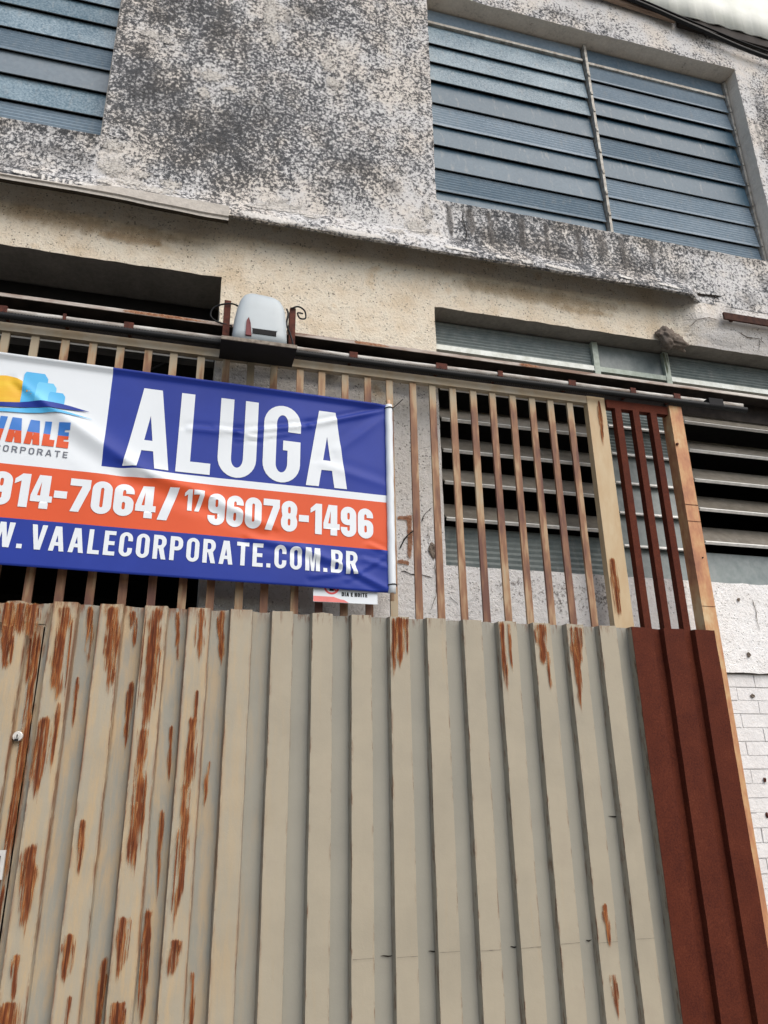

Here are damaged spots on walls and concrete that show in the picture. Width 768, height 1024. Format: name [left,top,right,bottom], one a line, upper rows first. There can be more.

leakage [239,210,306,225]
leakage [323,225,387,239]
leakage [445,206,478,253]
leakage [487,212,532,264]
leakage [597,235,634,280]
rust [534,624,552,688]
rust [570,626,583,709]
rust [0,601,80,935]
rust [85,606,163,874]
rust [171,690,210,926]
rust [0,955,22,1024]
rust [95,909,152,1024]